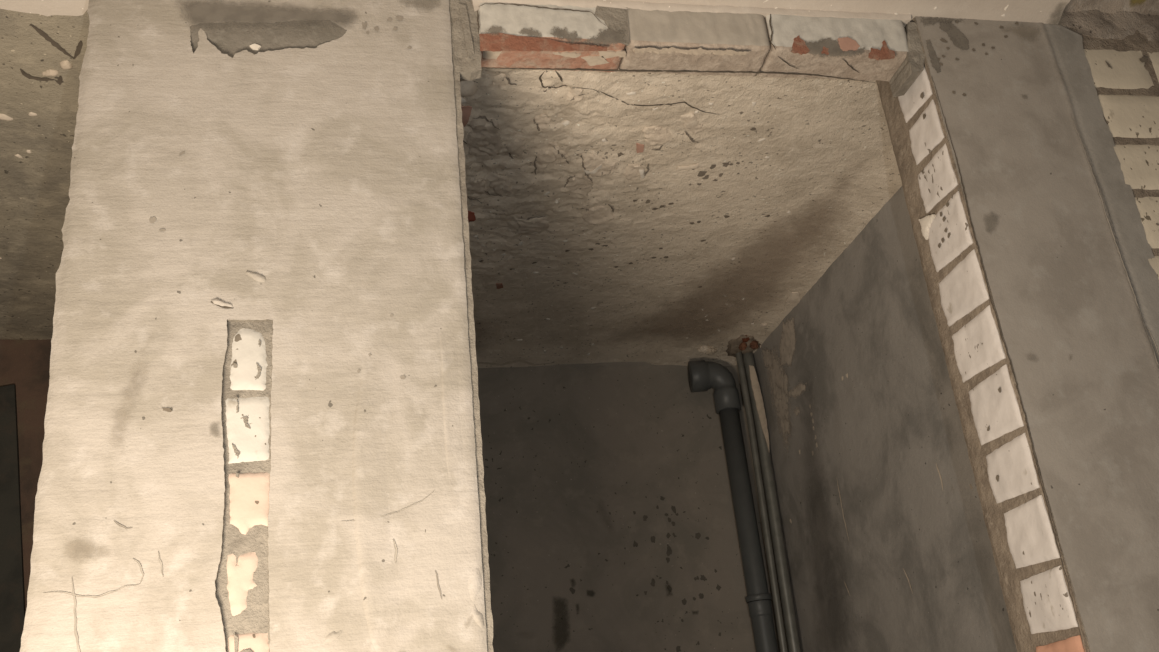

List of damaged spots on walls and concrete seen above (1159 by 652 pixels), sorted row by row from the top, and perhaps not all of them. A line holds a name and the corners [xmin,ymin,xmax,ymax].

damp [184,2,353,25]
spalling [479,6,750,66]
crack [477,3,875,114]
spalling [791,36,895,61]
damp [650,222,812,336]
flaking render [211,298,273,652]